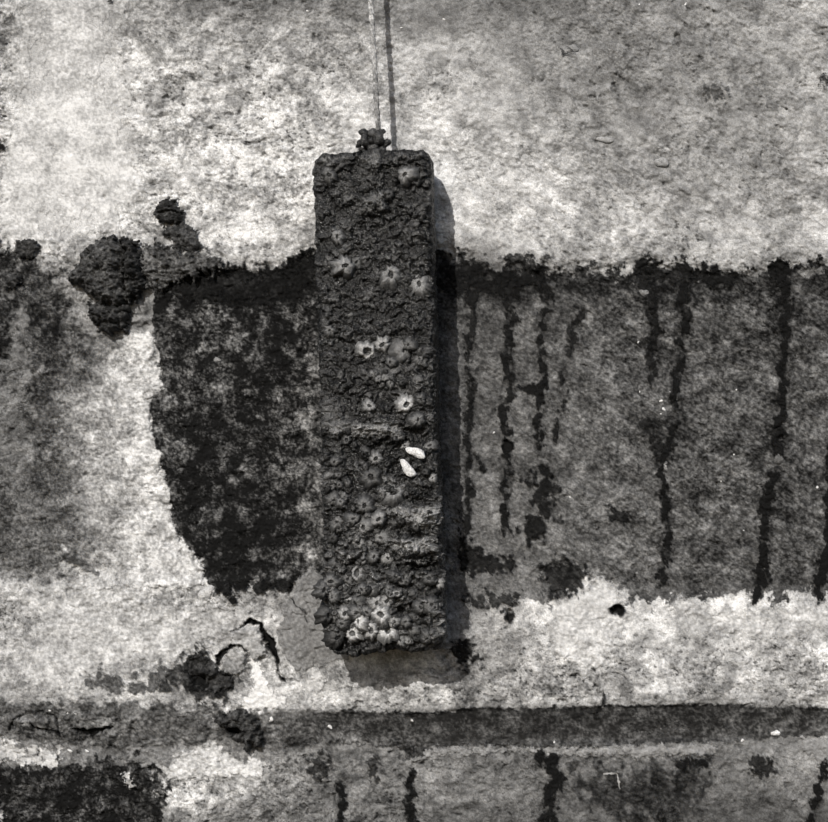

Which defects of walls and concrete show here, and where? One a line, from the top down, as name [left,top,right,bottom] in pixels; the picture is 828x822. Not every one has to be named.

damp [149,244,325,593]
damp [436,247,828,614]
crack [215,618,286,682]
damp [334,781,348,822]
damp [401,769,420,822]
damp [531,748,715,822]
damp [748,754,778,779]
damp [805,758,828,822]